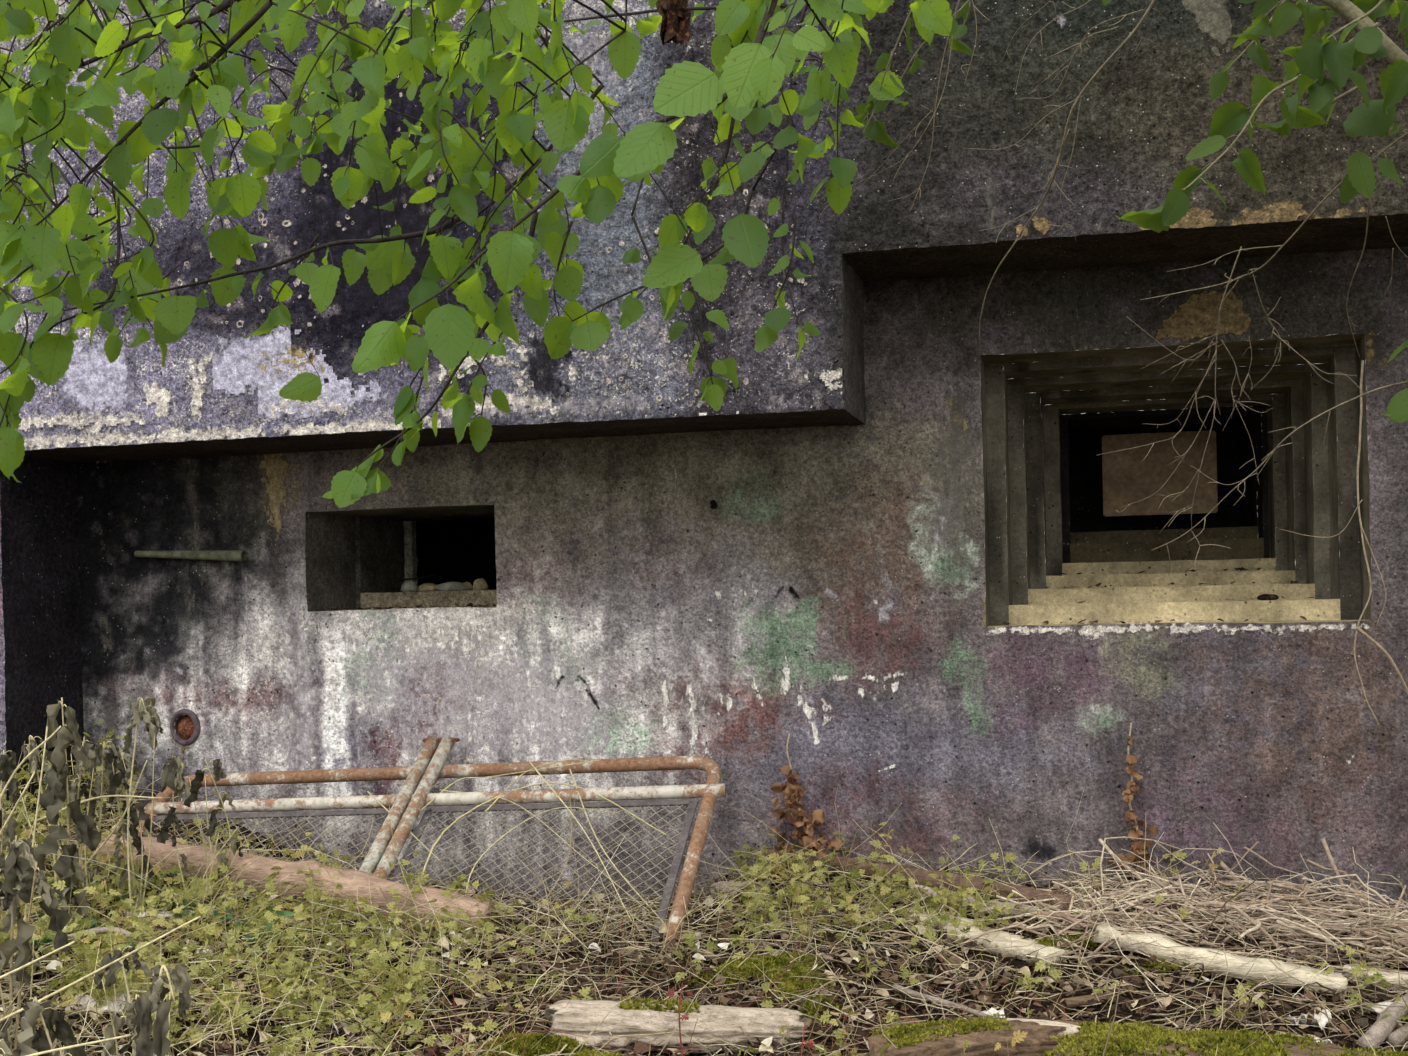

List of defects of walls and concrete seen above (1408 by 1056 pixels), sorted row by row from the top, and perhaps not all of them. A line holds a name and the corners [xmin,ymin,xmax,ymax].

spalling [1169,200,1366,228]
spalling [1155,289,1251,342]
crack [556,675,600,709]
rust [178,715,194,761]